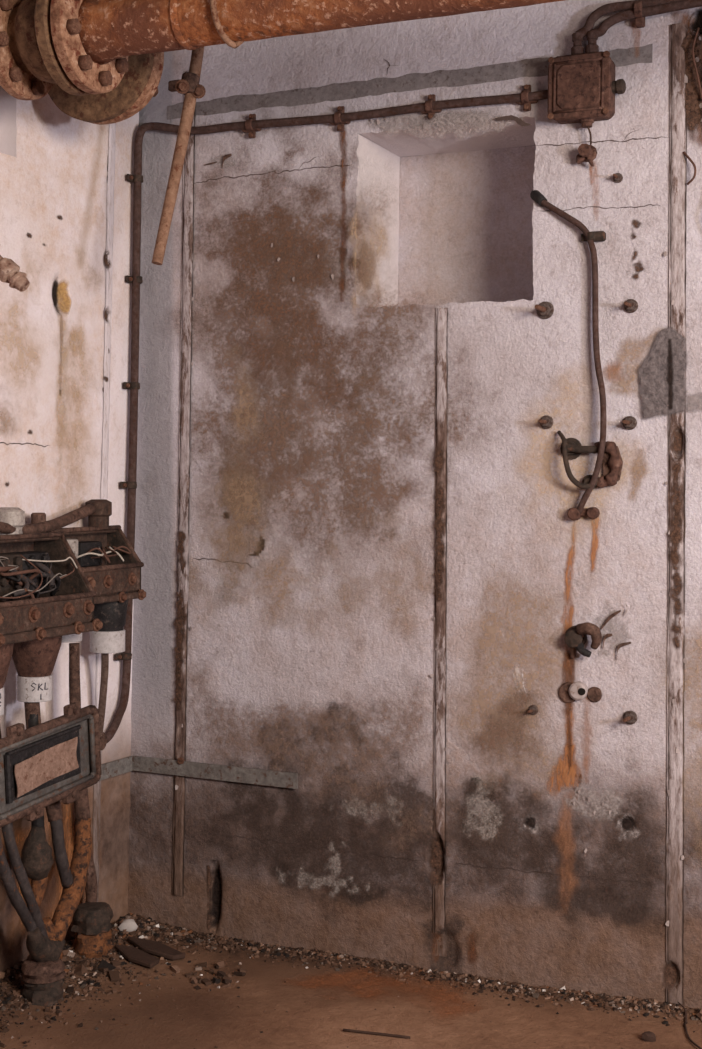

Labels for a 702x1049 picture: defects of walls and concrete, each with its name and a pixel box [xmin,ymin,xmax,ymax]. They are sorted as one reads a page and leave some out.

leakage [192,171,469,587]
leakage [205,693,434,906]
leakage [460,591,562,774]
leakage [456,778,661,925]
corrosion [549,703,588,792]
corrosion [563,527,575,683]
corrosion [591,518,599,571]